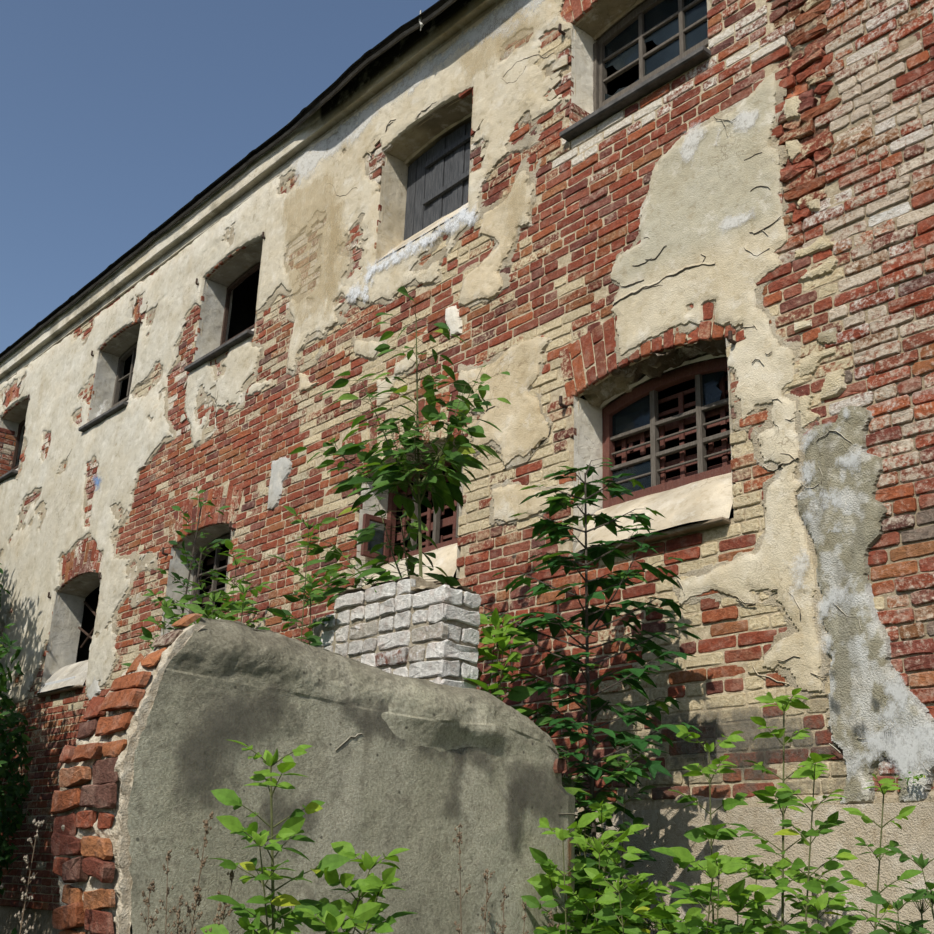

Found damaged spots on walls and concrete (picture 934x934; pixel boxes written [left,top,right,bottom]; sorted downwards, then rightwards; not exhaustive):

peeling [61,260,169,351]
damp [347,206,478,301]
crack [613,237,715,306]
crack [744,216,781,256]
peeling [97,0,934,810]
peeling [40,432,51,459]
crack [763,453,823,489]
peeling [56,460,103,592]
crack [735,588,801,620]
crack [753,655,827,685]
damp [873,678,908,720]
peeling [0,644,101,911]